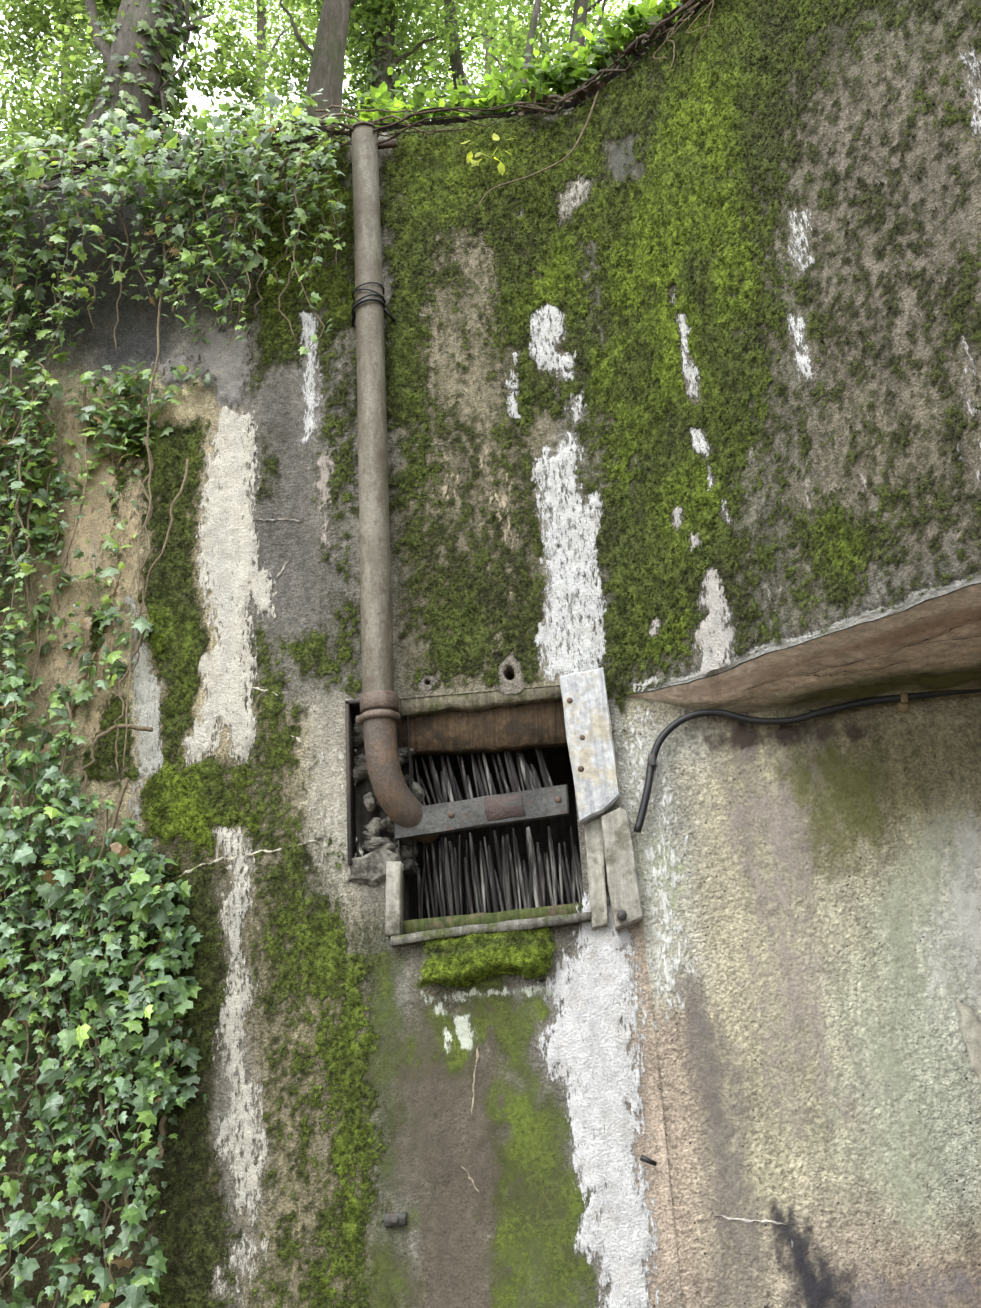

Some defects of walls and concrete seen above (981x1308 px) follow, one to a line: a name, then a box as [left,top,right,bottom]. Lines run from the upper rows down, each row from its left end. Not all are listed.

water stain [788,208,816,275]
water stain [667,289,701,398]
water stain [787,306,814,383]
water stain [960,335,980,420]
water stain [500,304,610,686]
water stain [671,506,702,551]
water stain [689,427,730,523]
water stain [421,566,981,1308]